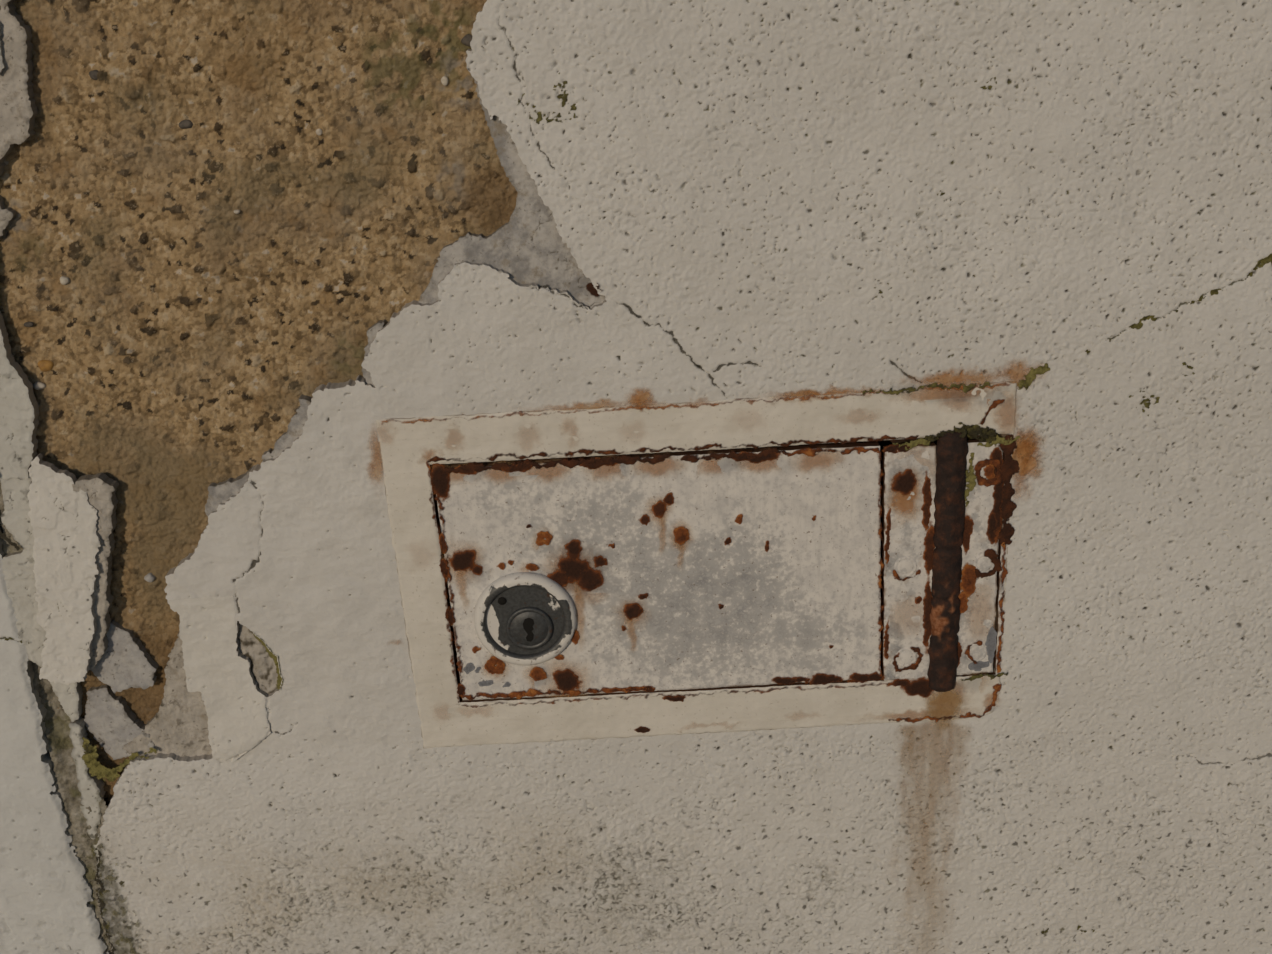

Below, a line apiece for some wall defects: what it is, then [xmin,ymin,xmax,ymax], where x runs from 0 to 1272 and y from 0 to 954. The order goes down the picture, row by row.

crack [0,22,8,75]
crack [1085,254,1272,353]
crack [532,285,758,396]
flaking render [0,0,606,807]
rust [564,400,610,410]
rust [630,390,651,406]
rust [790,388,862,396]
rust [925,371,990,387]
rust [1012,433,1040,485]
crack [0,311,124,954]